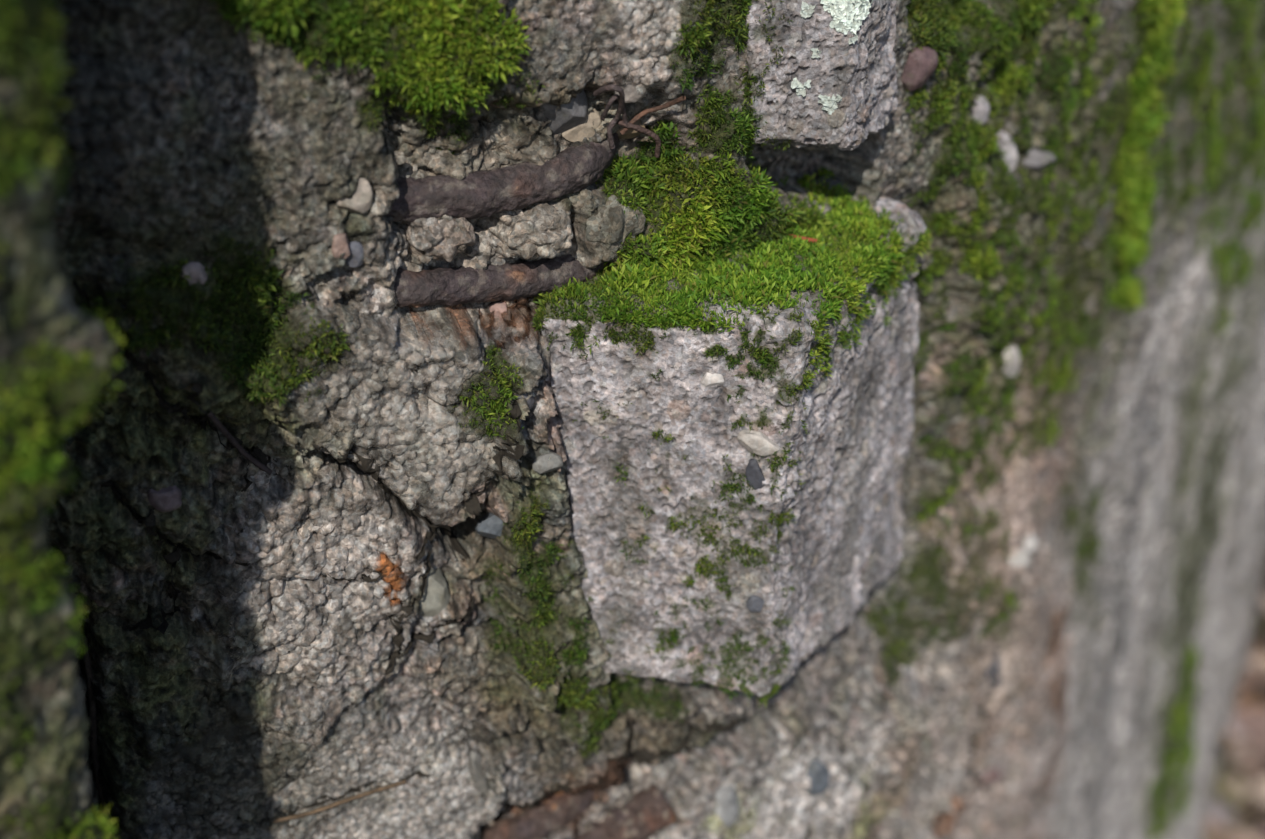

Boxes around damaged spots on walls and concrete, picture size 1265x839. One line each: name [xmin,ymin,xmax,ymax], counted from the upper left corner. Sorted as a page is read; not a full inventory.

spalling [364,116,631,346]
crack [77,652,108,806]
spalling [478,761,687,839]